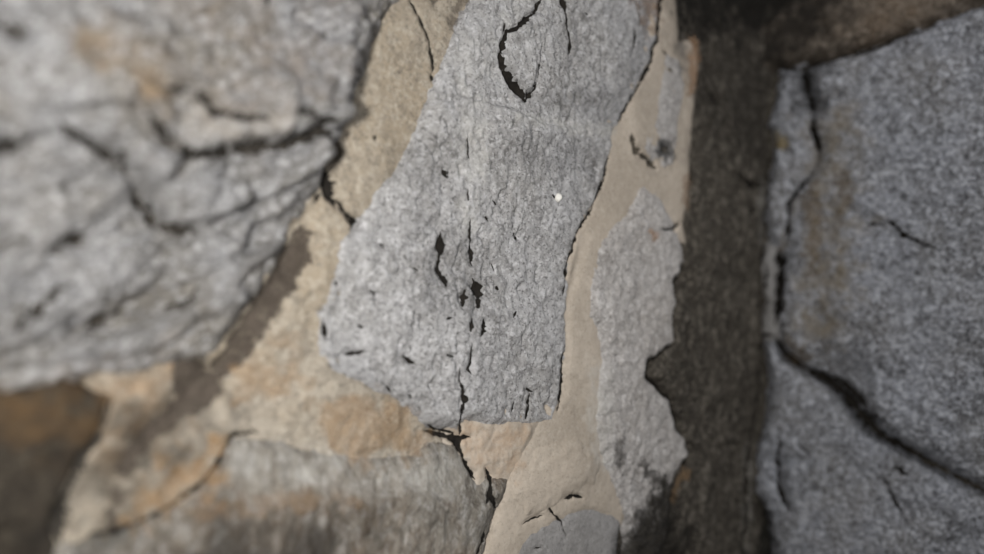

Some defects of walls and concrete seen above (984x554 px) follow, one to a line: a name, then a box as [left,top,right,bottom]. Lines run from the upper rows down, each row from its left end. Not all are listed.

crack [0,21,30,61]
crack [0,132,33,155]
crack [59,119,199,237]
crack [148,85,357,229]
crack [497,0,572,103]
crack [782,27,933,155]
crack [424,191,496,508]
crack [739,179,933,554]